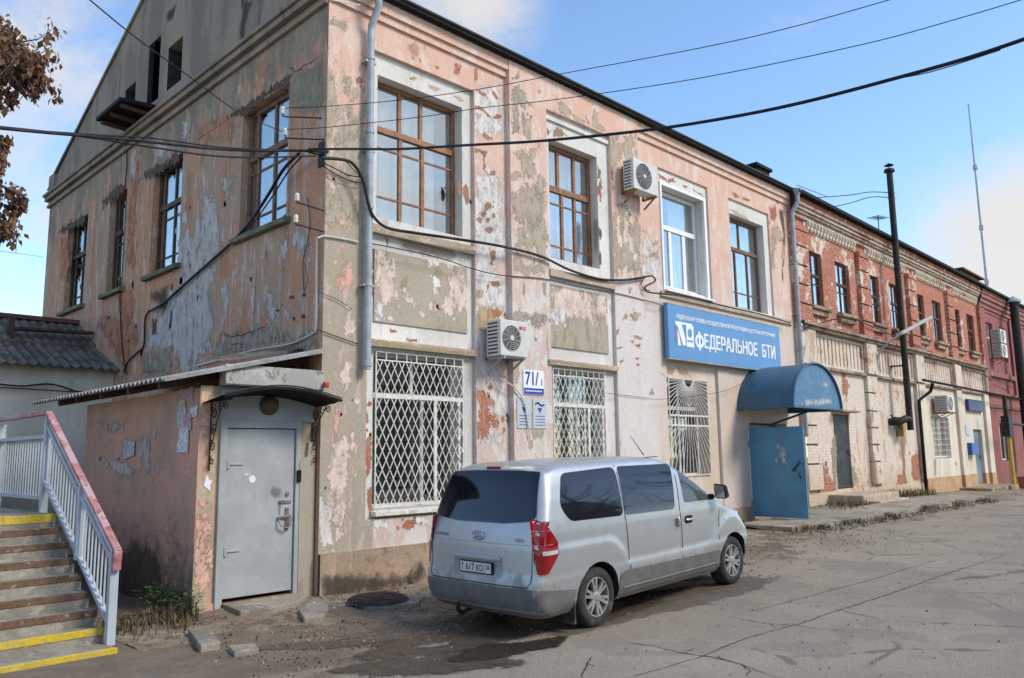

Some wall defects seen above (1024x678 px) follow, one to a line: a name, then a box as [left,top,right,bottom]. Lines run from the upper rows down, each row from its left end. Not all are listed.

spalling [226,75,291,119]
peeling [454,68,637,342]
peeling [402,241,455,318]
peeling [613,202,663,294]
peeling [477,383,509,447]
peeling [99,426,157,484]
peeling [349,397,374,516]
water stain [118,541,182,610]